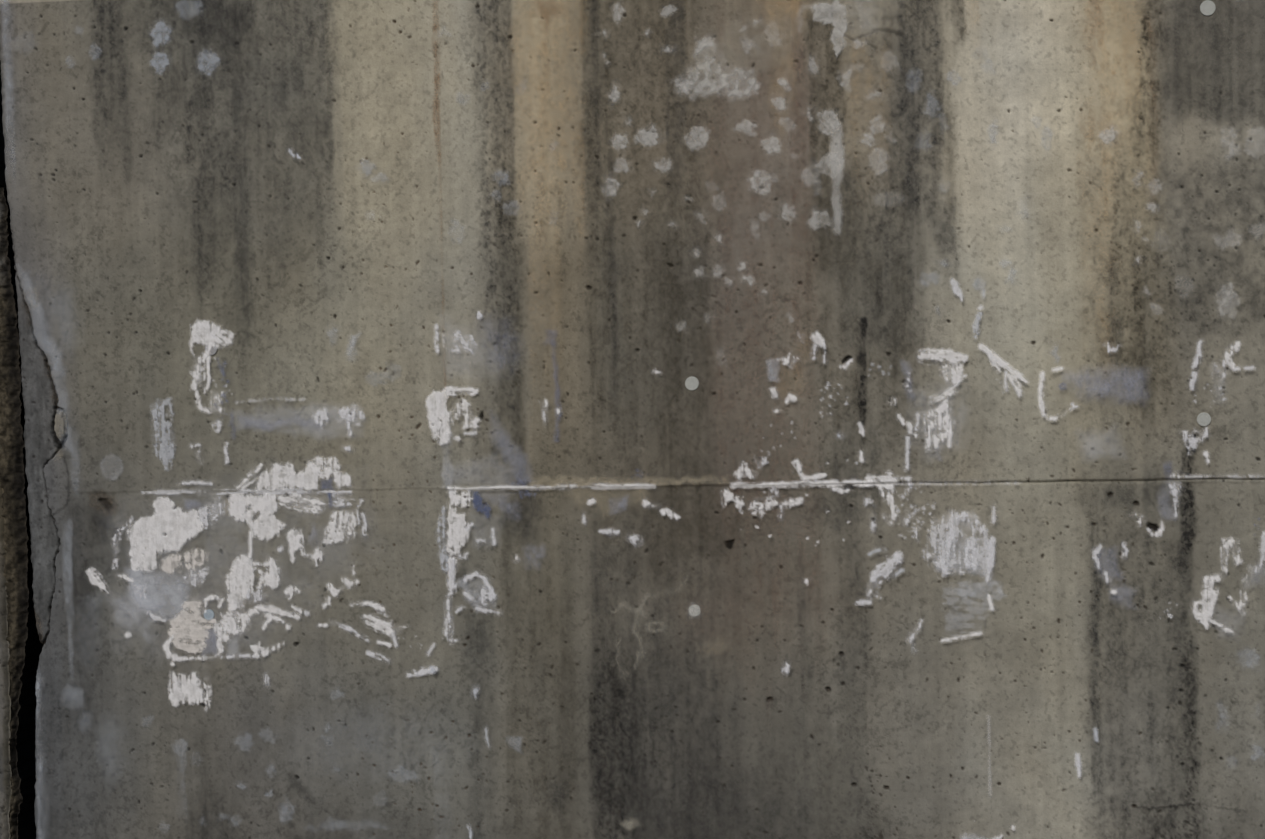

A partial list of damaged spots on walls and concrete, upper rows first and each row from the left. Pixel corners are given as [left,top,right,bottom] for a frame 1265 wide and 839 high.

crack [16,269,69,644]
leakage [92,0,128,165]
leakage [146,0,258,311]
peeling [190,321,234,433]
peeling [86,407,405,708]
peeling [426,386,483,445]
peeling [407,477,706,677]
leakage [589,562,753,839]
leakage [581,0,958,555]
peeling [769,332,826,413]
peeling [723,451,960,538]
leakage [1094,0,1265,418]